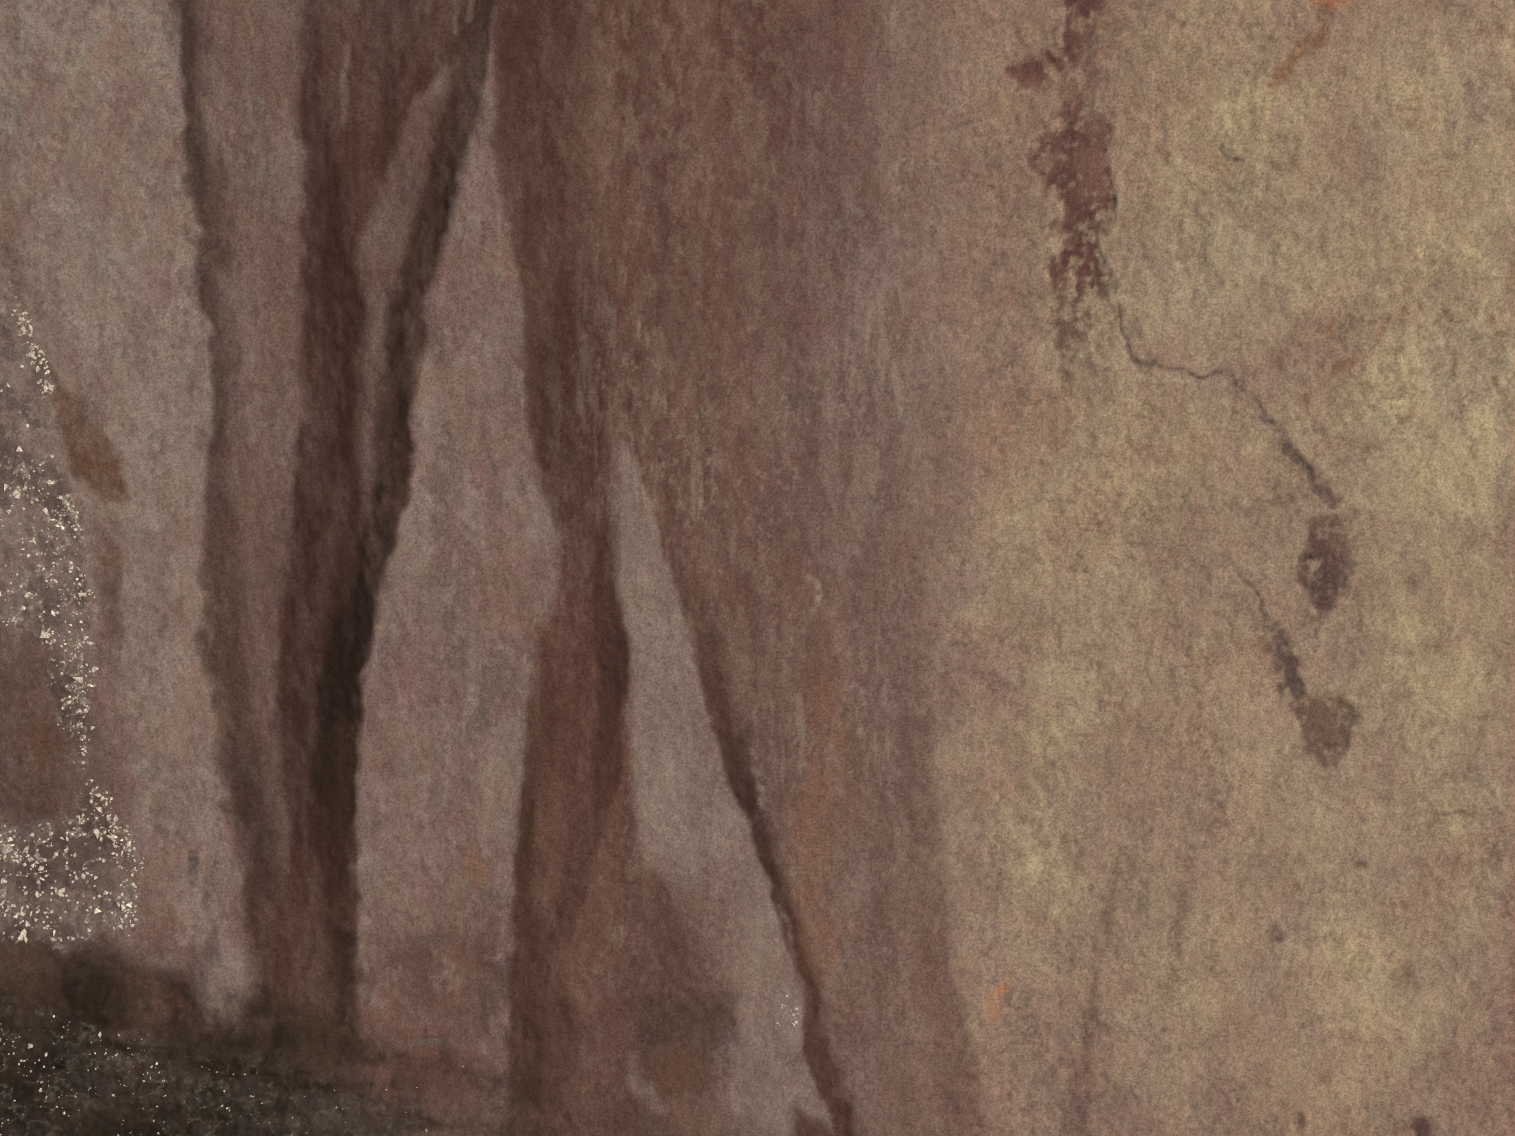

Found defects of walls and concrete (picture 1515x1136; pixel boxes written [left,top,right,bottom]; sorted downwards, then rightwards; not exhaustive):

damp [0,0,1003,1136]
damp [943,0,1515,1136]
crack [1110,278,1355,509]
crack [1207,136,1301,178]